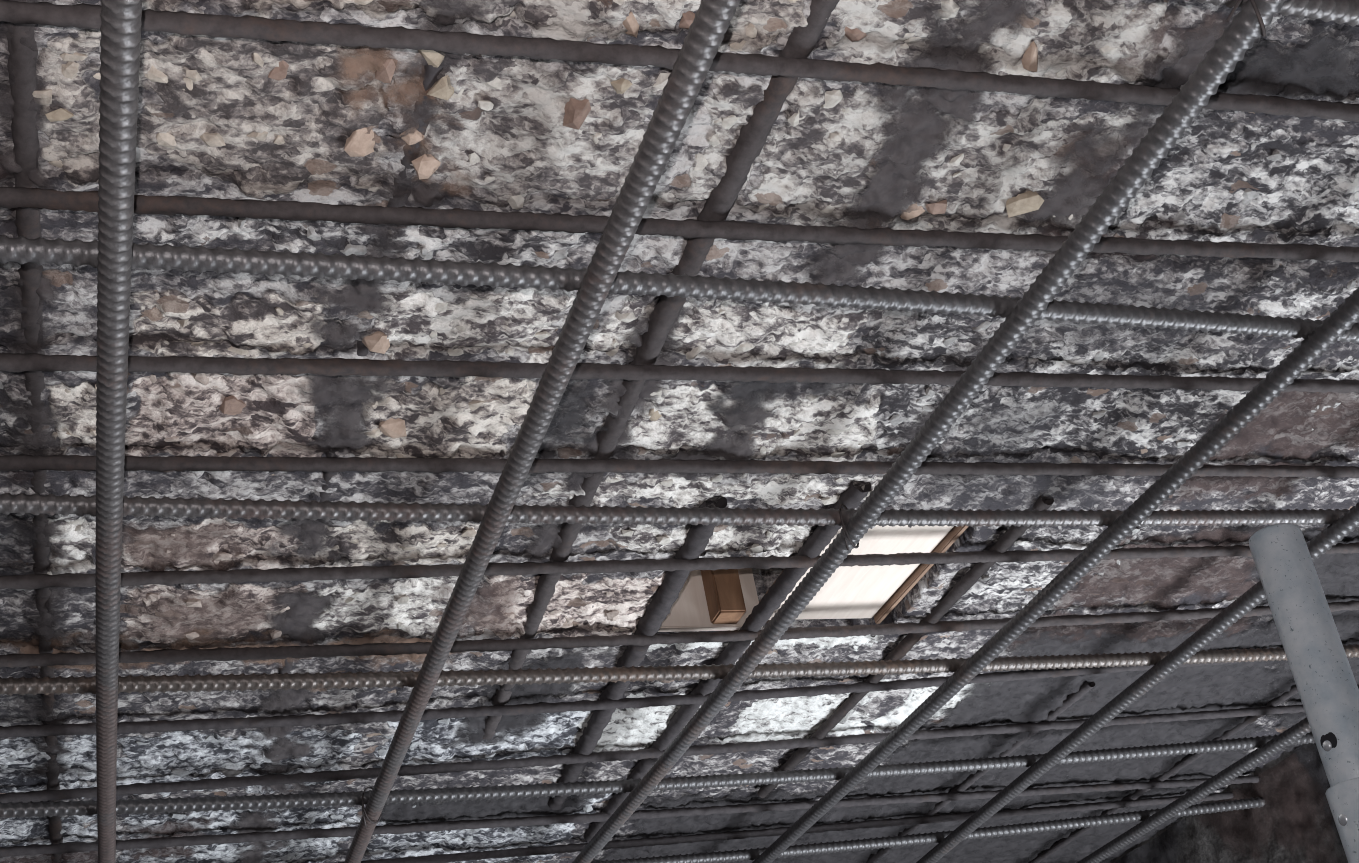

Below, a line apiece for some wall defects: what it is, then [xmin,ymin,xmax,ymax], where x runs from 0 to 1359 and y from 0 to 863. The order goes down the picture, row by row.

leakage [418,0,489,32]
leakage [912,0,1032,73]
leakage [368,177,449,209]
leakage [804,86,985,286]
leakage [1018,102,1155,232]
leakage [311,278,390,351]
leakage [300,374,392,453]
spalling [0,0,1022,863]
leakage [668,389,793,480]
spalling [750,0,1359,863]
leakage [268,519,355,646]
leakage [230,689,314,863]